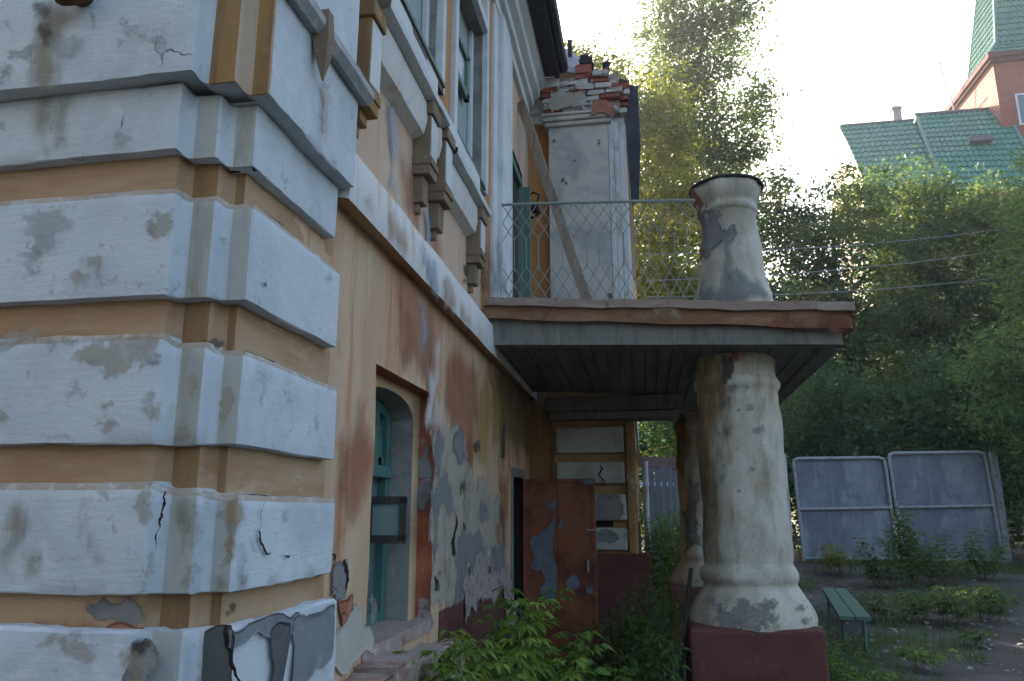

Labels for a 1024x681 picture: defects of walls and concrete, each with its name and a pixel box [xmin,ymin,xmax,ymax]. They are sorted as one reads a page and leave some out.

crack [155,38,193,65]
spalling [540,64,630,124]
spalling [690,187,737,261]
crack [155,491,166,549]
crack [259,502,295,558]
spalling [417,419,516,628]
spalling [596,493,624,543]
spalling [86,596,159,681]
peeling [271,559,348,681]
spalling [708,597,779,636]